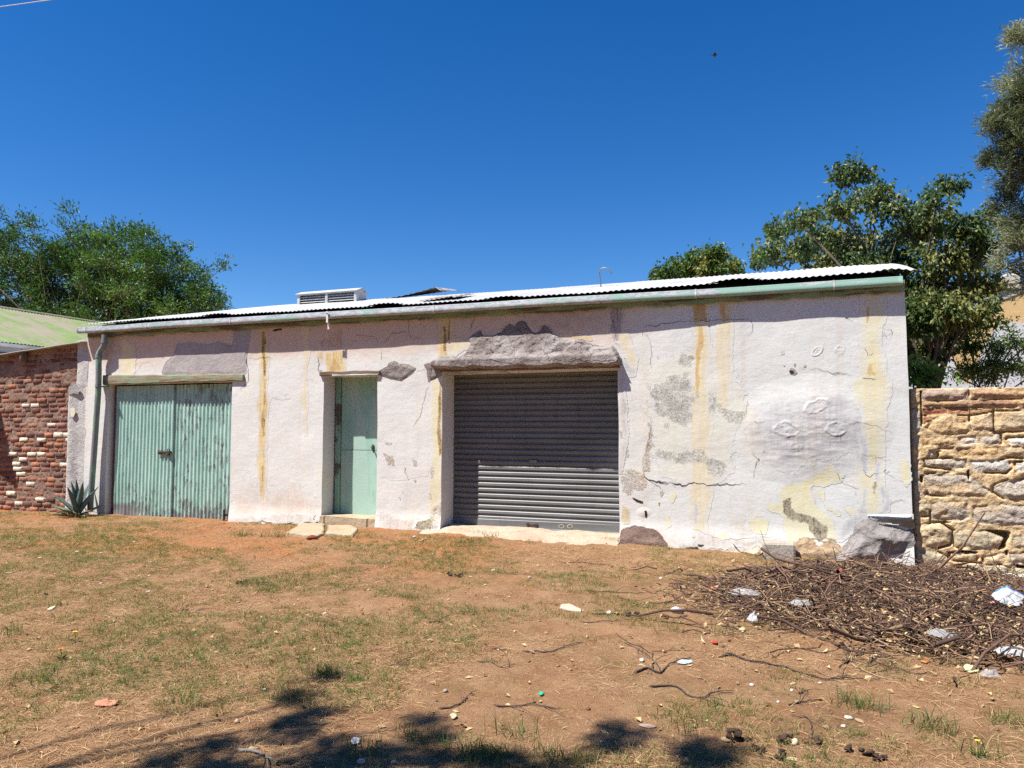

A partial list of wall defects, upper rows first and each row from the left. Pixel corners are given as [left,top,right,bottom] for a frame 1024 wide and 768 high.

crack [643,426,758,486]
damp [619,292,893,543]
peeling [715,464,859,559]